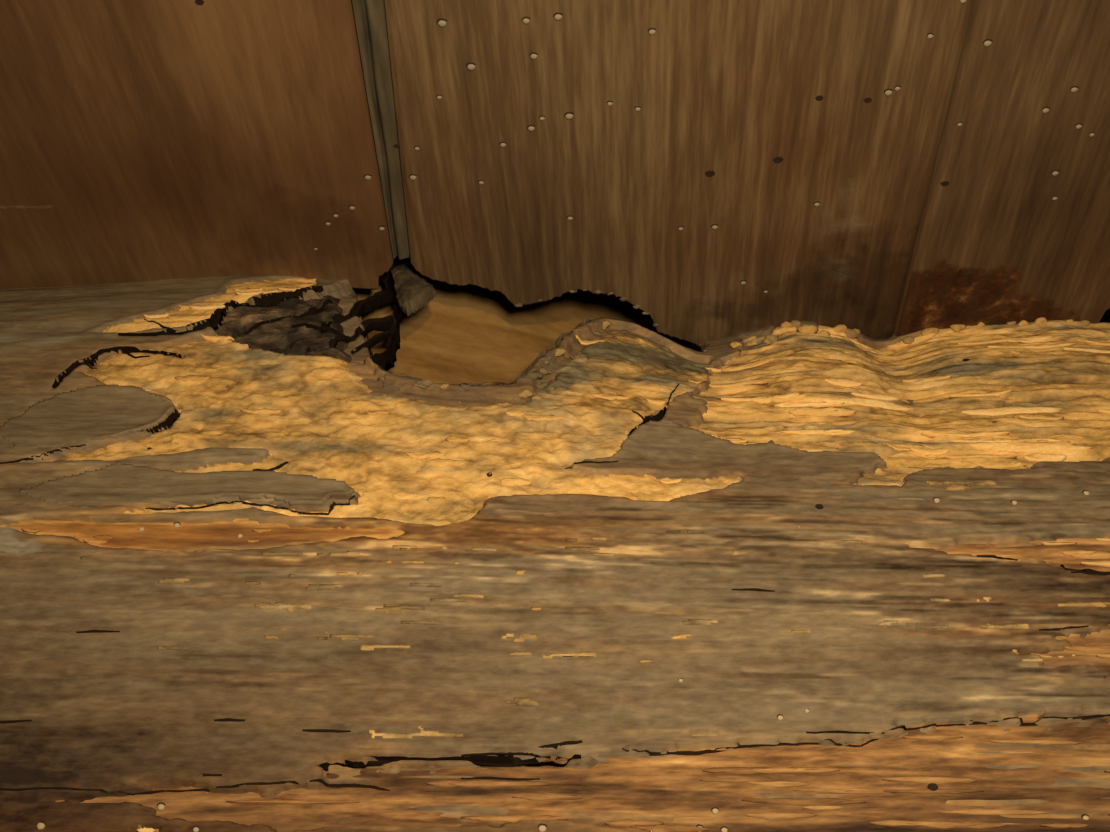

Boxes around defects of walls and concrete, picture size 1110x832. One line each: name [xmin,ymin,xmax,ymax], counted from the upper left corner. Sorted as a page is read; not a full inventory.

crack [52,269,403,389]
spalling [0,278,1110,564]
spalling [935,536,1110,572]
spalling [255,602,312,612]
spalling [671,619,718,639]
spalling [1012,624,1110,679]
crack [0,717,32,725]
crack [302,727,351,735]
crack [622,714,1110,756]
crack [0,740,583,795]